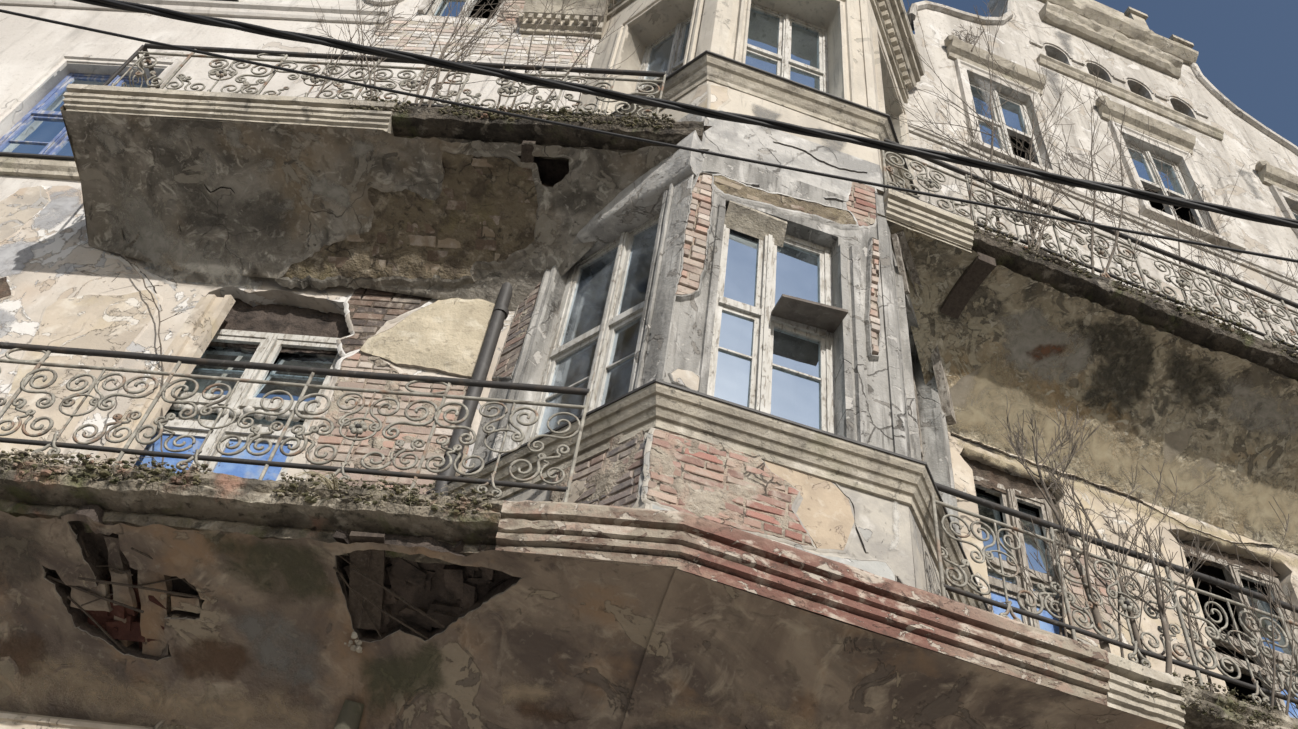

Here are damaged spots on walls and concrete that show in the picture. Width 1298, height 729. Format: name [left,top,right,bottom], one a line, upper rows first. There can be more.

flaking render [0,185,82,325]
flaking render [208,145,544,495]
damp [956,307,1298,544]
flaking render [548,427,904,584]
damp [1257,549,1298,566]
damp [0,634,48,693]
damp [68,616,313,729]